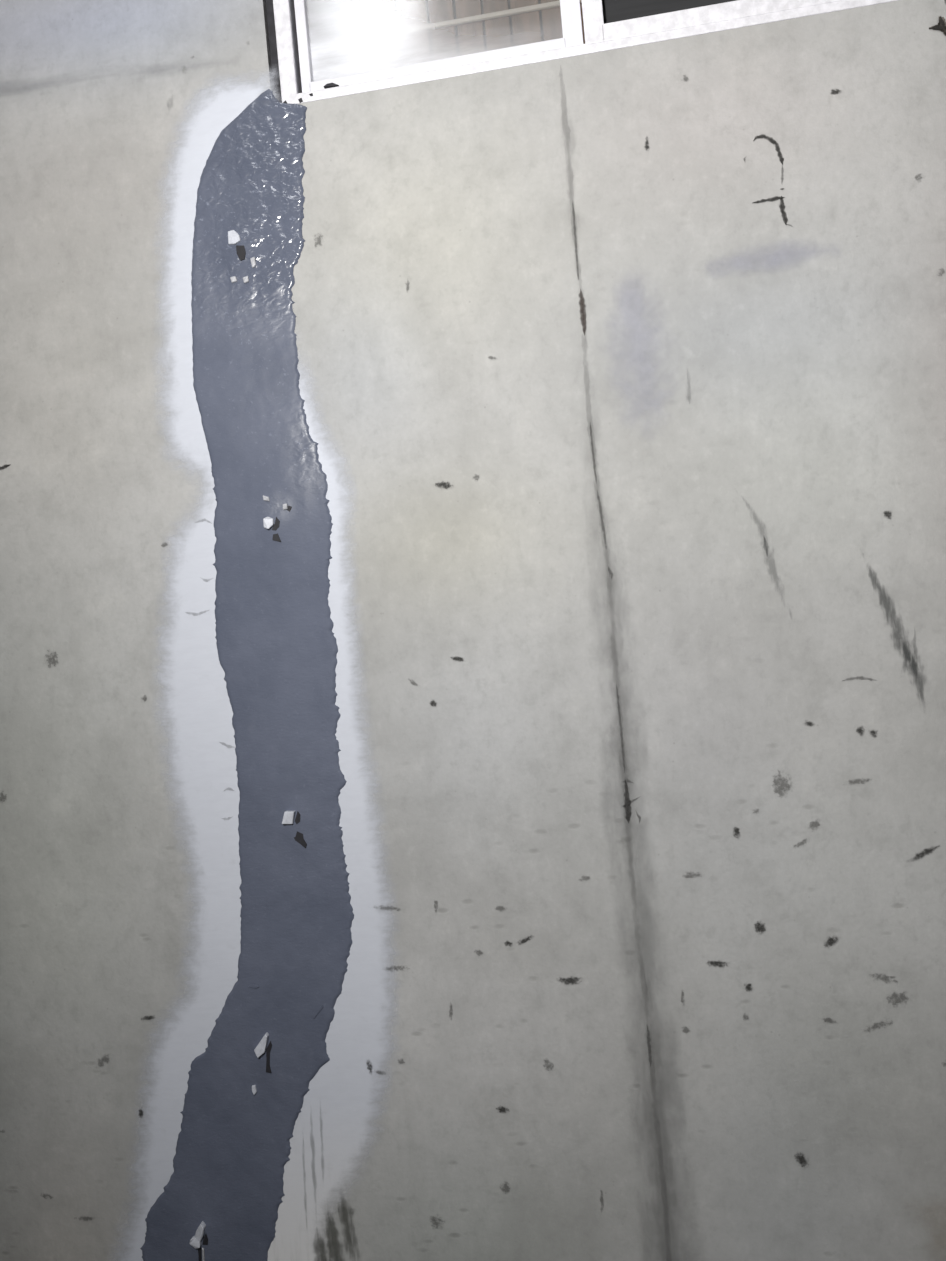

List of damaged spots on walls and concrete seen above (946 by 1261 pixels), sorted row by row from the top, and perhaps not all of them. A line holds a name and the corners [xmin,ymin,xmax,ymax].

crack [753,134,788,225]
crack [578,289,586,335]
water stain [119,76,274,1261]
water stain [267,370,394,1261]
crack [623,781,631,823]